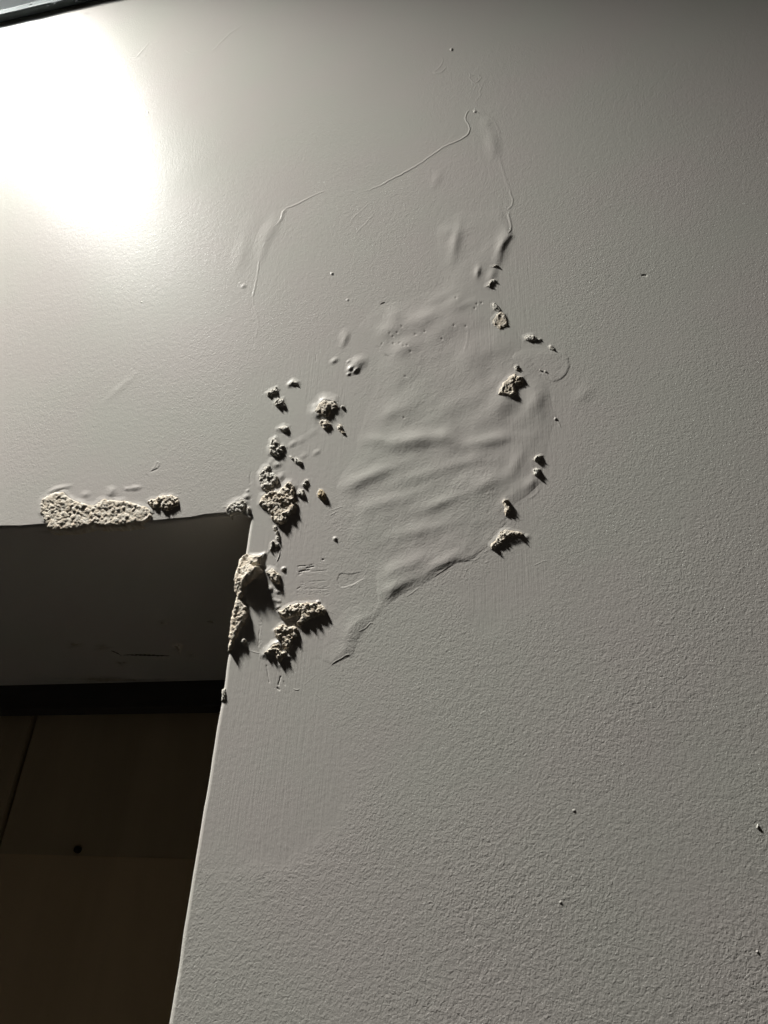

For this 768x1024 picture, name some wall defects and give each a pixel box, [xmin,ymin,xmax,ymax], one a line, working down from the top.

spalling [495,364,527,400]
spalling [531,453,544,478]
spalling [36,459,181,536]
spalling [221,377,368,668]
spalling [487,498,533,552]